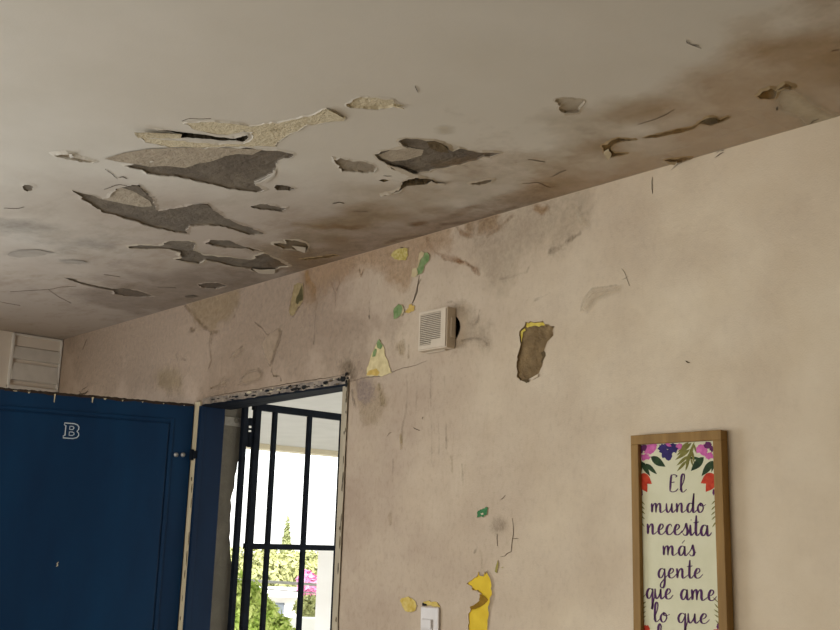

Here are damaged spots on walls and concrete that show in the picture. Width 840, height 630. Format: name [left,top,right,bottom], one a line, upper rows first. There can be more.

peeling [553,97,587,116]
flaking render [755,81,798,110]
peeling [48,96,405,193]
peeling [331,137,504,197]
peeling [71,183,340,274]
peeling [391,247,431,320]
peeling [366,339,392,377]
flaking render [516,321,555,383]
peeling [202,372,350,630]
peeling [466,560,503,630]